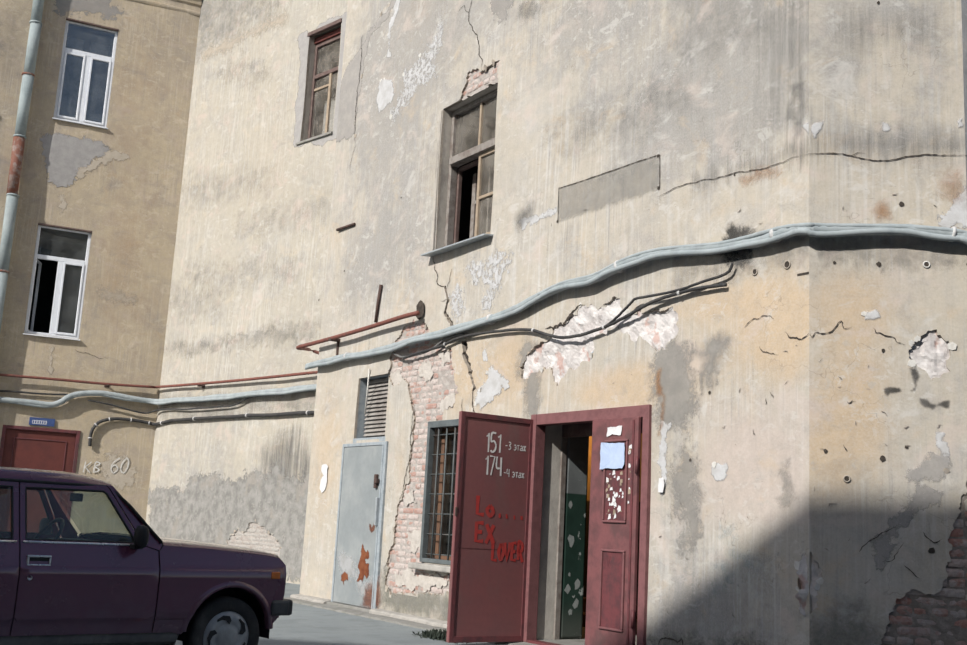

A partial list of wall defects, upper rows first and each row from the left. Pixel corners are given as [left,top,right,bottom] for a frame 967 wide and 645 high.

crack [658,152,960,197]
crack [433,257,453,323]
spalling [522,299,679,385]
water stain [650,338,728,429]
crack [760,321,851,354]
spalling [908,330,957,379]
water stain [270,435,307,478]
flaking render [385,300,459,595]
spalling [147,460,309,582]
rust [341,544,379,608]
water stain [671,450,703,555]
flaking render [881,481,967,645]